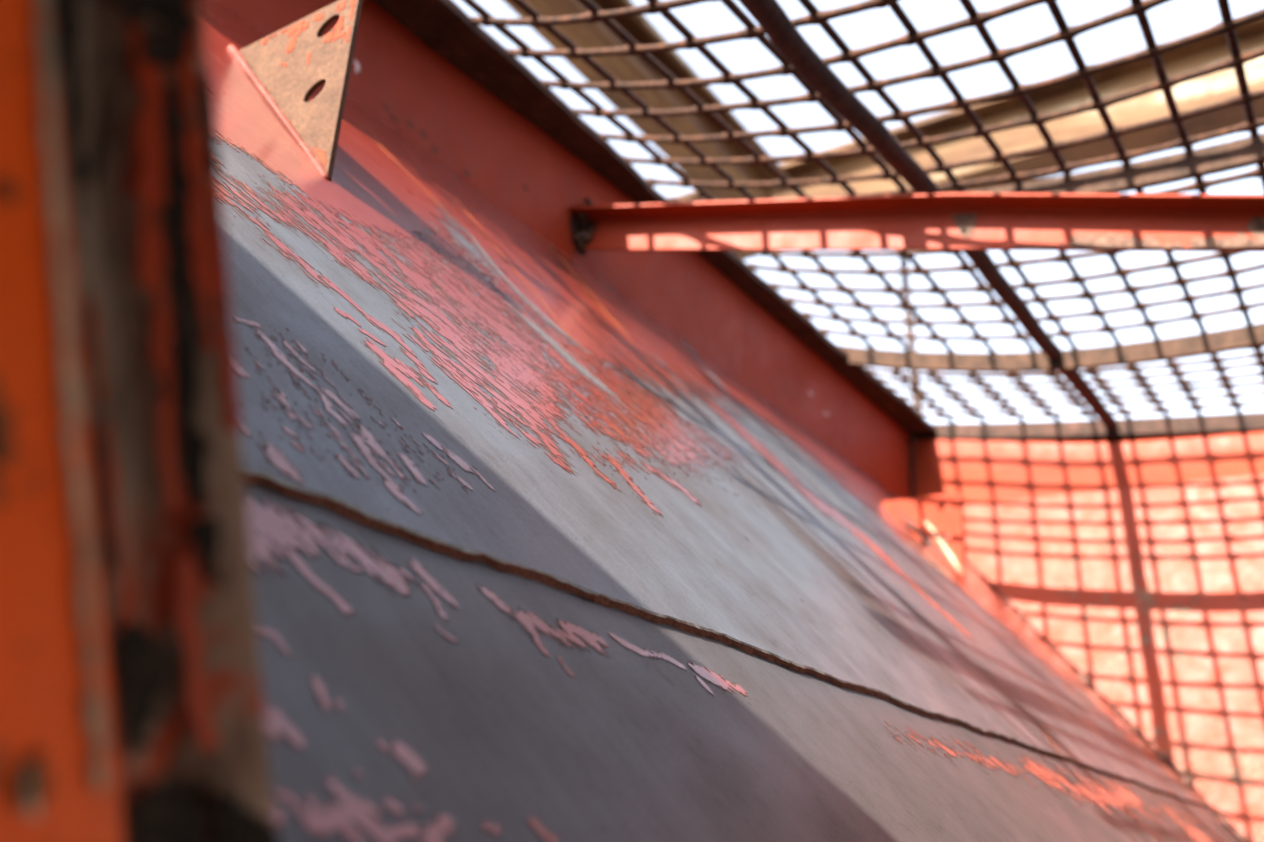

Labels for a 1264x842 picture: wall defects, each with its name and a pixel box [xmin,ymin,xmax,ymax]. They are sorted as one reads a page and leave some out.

peeling [126,0,977,645]
peeling [175,555,220,754]
peeling [476,585,750,699]
peeling [264,703,306,753]
peeling [272,776,456,842]
peeling [374,739,428,782]